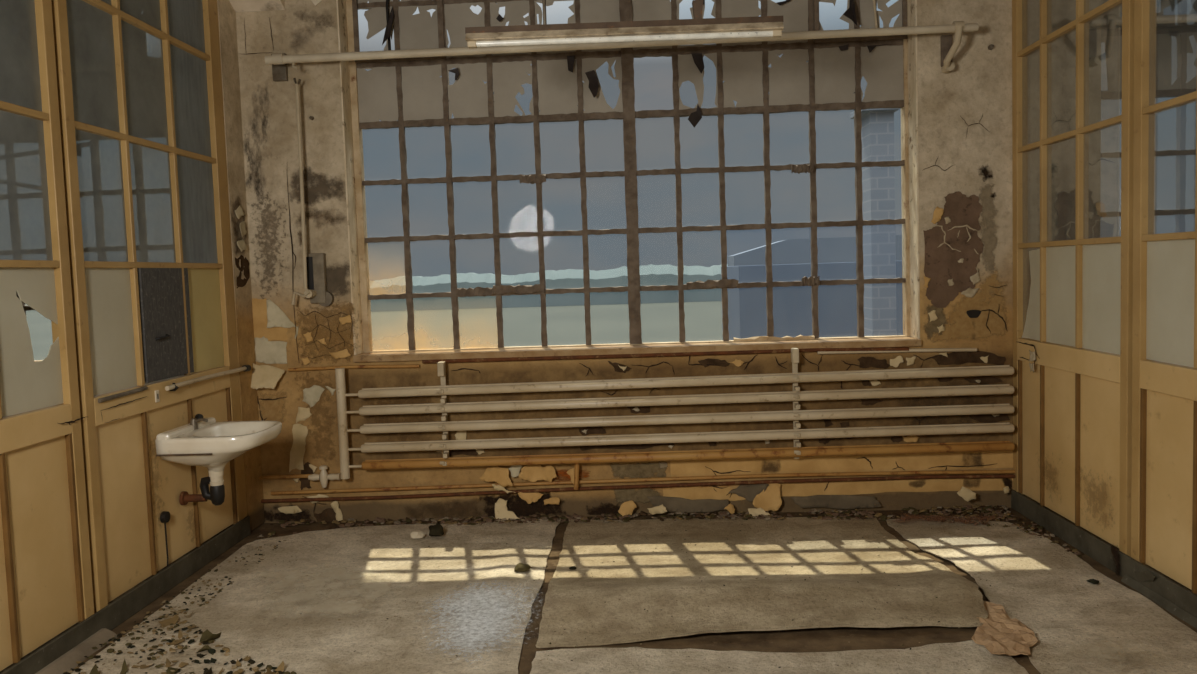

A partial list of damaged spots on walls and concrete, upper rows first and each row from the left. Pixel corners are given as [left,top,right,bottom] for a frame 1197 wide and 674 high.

water stain [292,169,344,243]
water stain [326,265,349,295]
flaking render [923,185,1006,385]
peeling [1022,249,1040,341]
peeling [233,199,351,522]
flaking render [858,356,916,405]
flaking render [969,414,1010,423]
peeling [492,465,574,520]
peeling [579,419,1013,515]